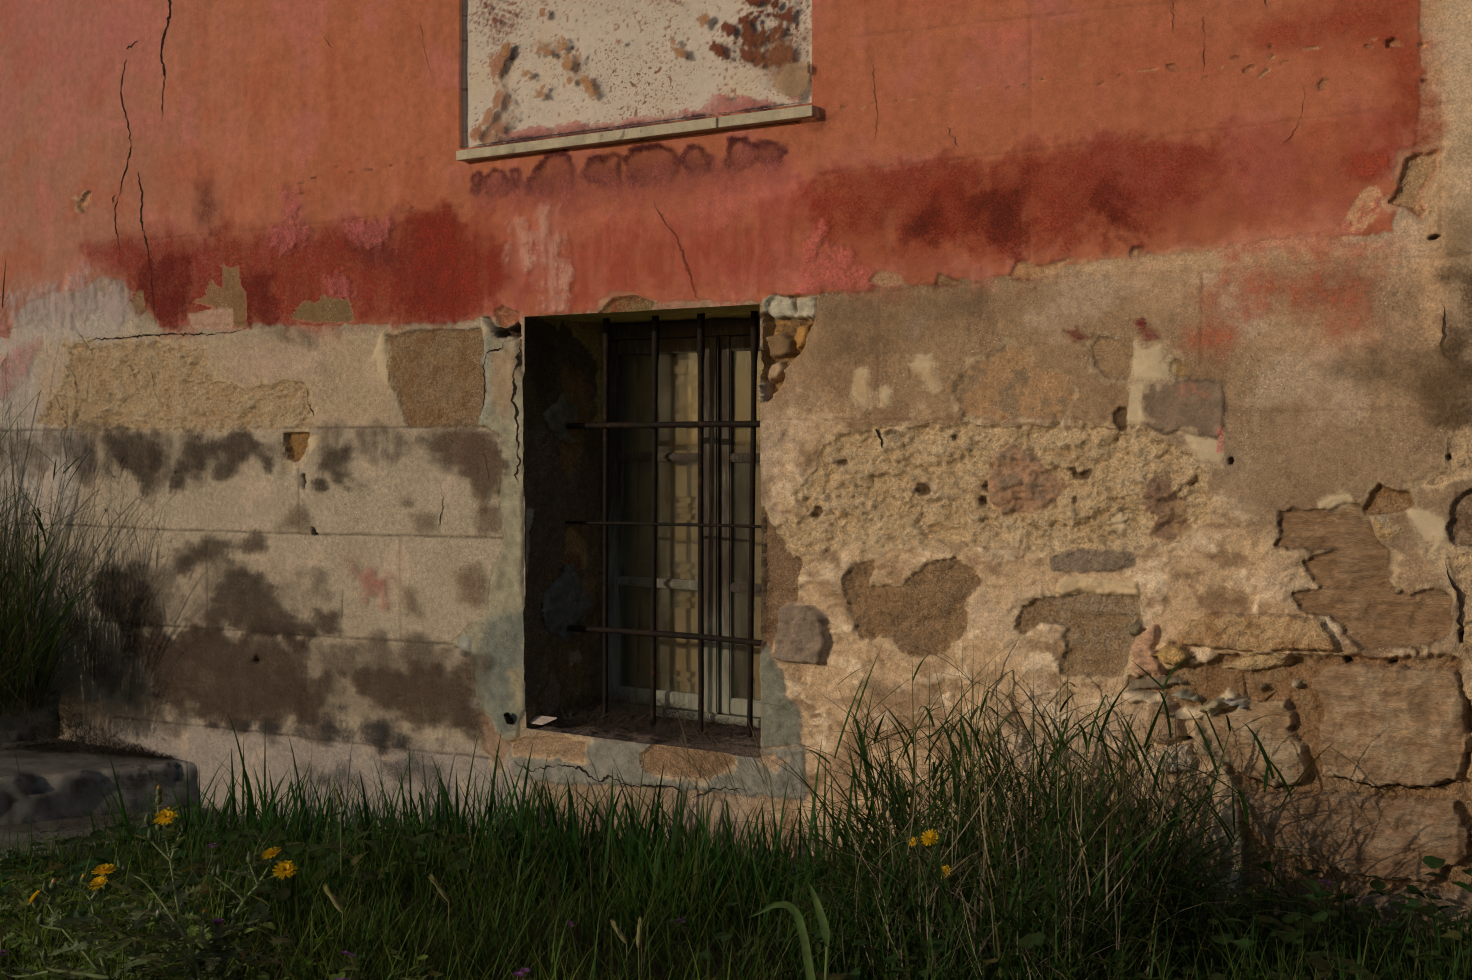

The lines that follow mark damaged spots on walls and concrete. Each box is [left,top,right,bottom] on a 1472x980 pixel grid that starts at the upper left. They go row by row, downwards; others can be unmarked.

peeling [470,0,810,143]
leakage [0,424,286,494]
crack [87,0,245,342]
spalling [37,339,327,462]
peeling [188,263,247,330]
leakage [0,185,506,346]
leakage [470,113,786,310]
spalling [758,294,818,404]
spalling [776,336,1223,597]
leakage [795,142,1214,295]
leakage [65,529,488,790]
flaking render [1123,399,1472,950]